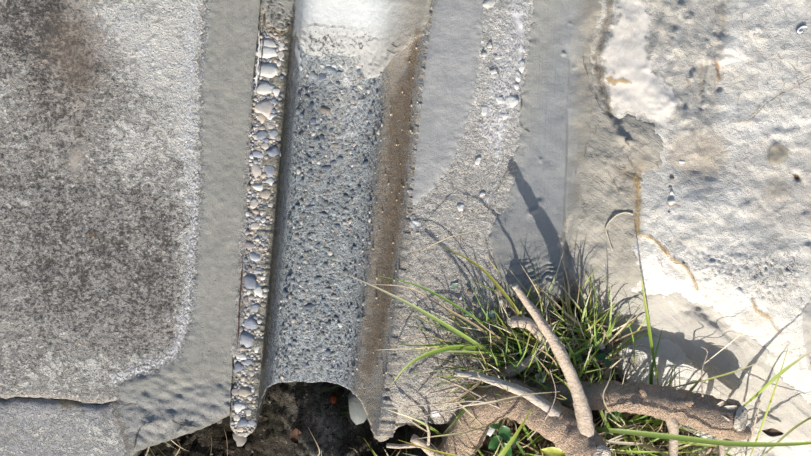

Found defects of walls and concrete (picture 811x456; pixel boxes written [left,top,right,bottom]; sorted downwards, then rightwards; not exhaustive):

water stain [768,144,788,165]
crack [649,237,696,283]
crack [0,397,136,406]
crack [133,419,197,450]